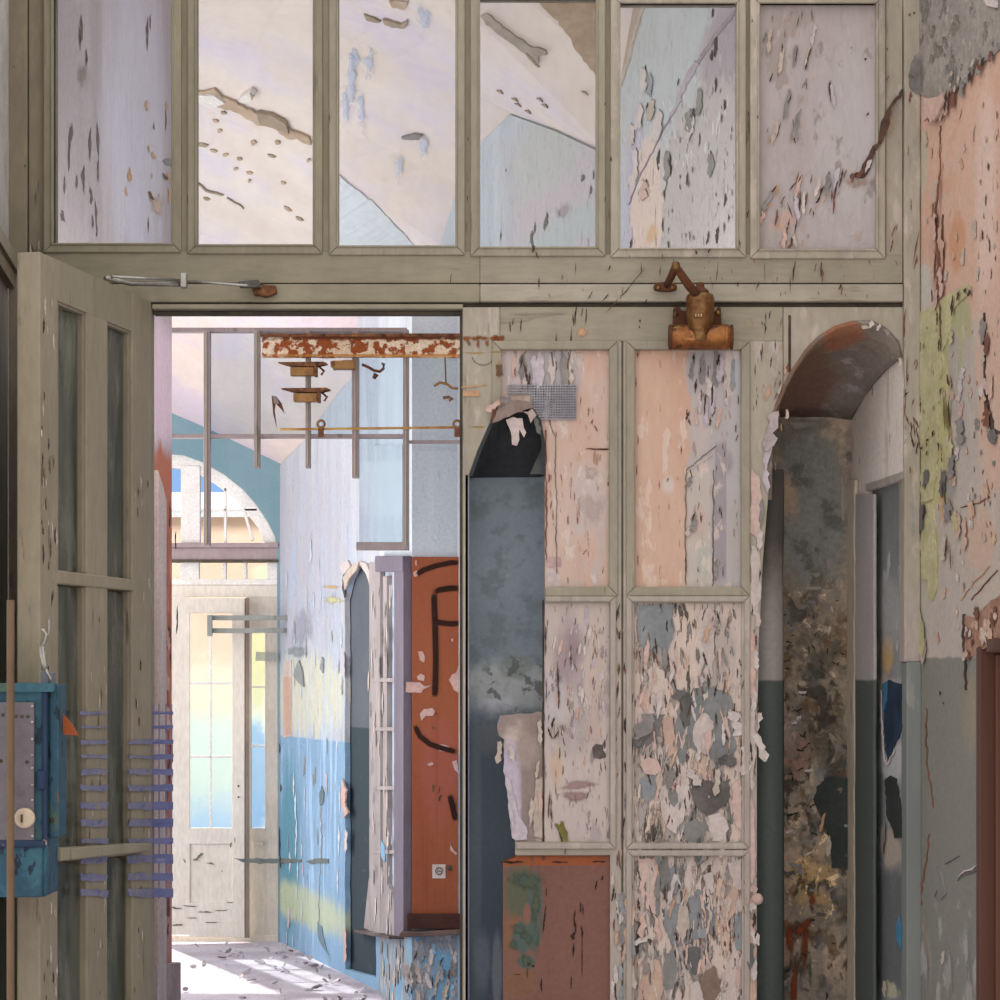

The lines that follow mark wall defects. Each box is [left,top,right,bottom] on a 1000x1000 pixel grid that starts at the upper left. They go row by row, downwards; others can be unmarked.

peeling [495,741,515,764]
peeling [505,311,789,1000]